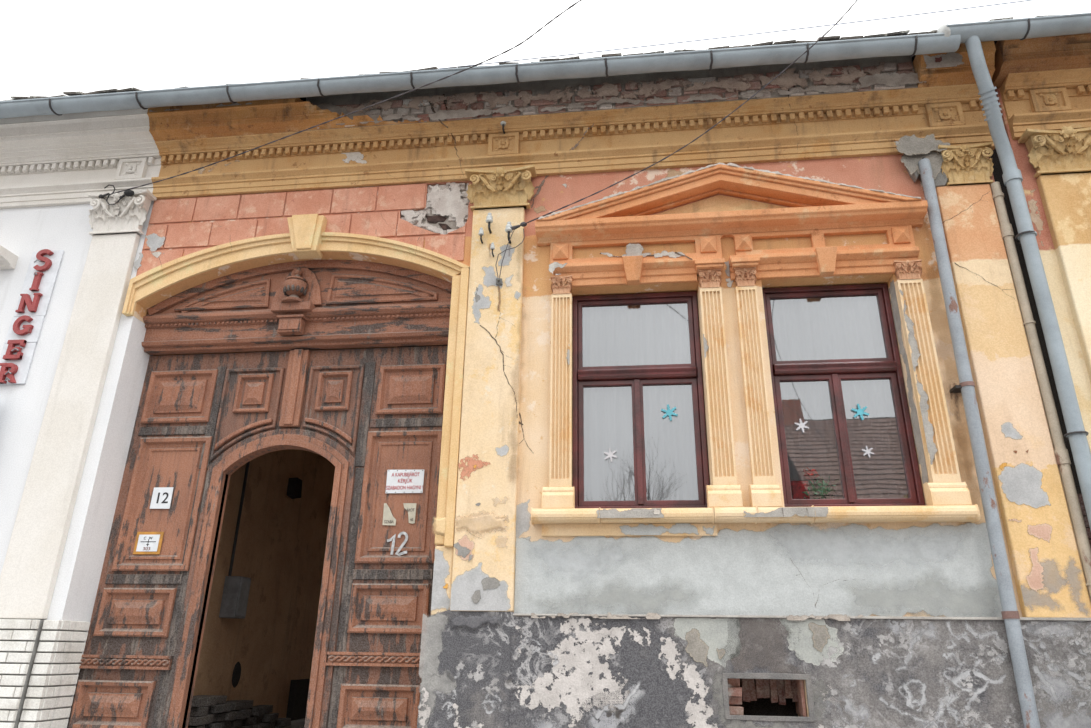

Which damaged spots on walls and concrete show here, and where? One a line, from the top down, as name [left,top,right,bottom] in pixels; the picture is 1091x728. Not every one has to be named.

flaking render [305,52,965,131]
peeling [895,134,950,184]
flaking render [401,182,470,235]
flaking render [134,233,165,270]
flaking render [472,245,521,324]
flaking render [601,243,685,258]
crack [480,309,532,451]
flaking render [998,422,1051,508]
flaking render [431,497,1002,668]
flaking render [1009,518,1088,615]